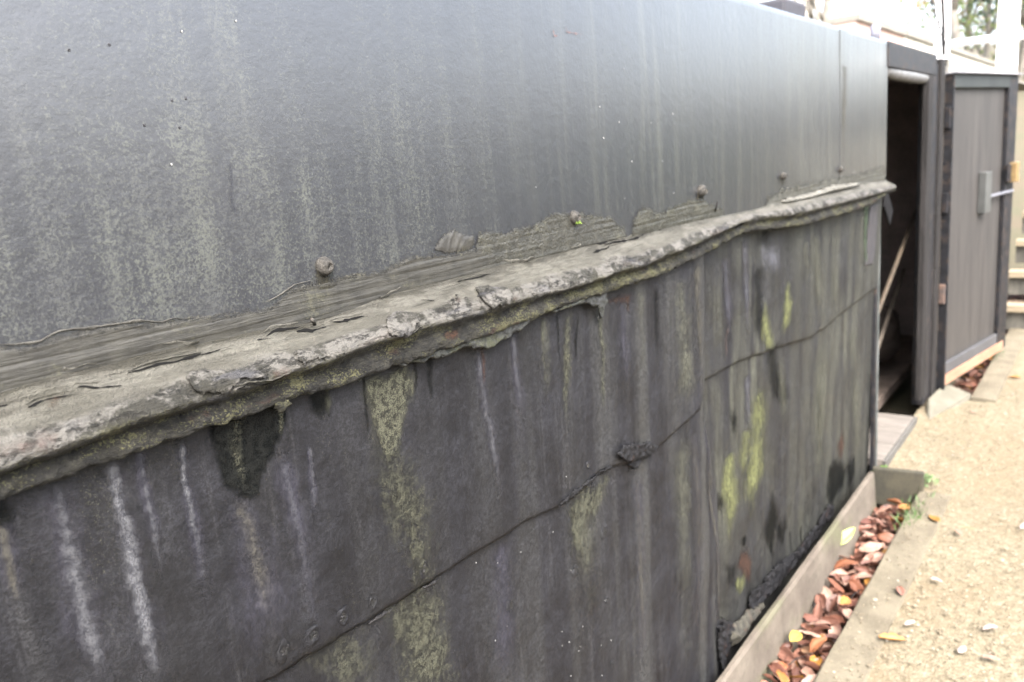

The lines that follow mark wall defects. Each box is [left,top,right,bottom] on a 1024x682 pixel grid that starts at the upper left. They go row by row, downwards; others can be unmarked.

peeling [865,204,878,266]
peeling [382,311,420,339]
peeling [451,285,513,309]
peeling [186,369,269,394]
leakage [181,447,199,549]
leakage [211,406,286,497]
leakage [283,466,302,535]
peeling [765,497,786,548]
peeling [827,460,855,502]
leakage [111,467,154,654]
leakage [68,546,94,646]